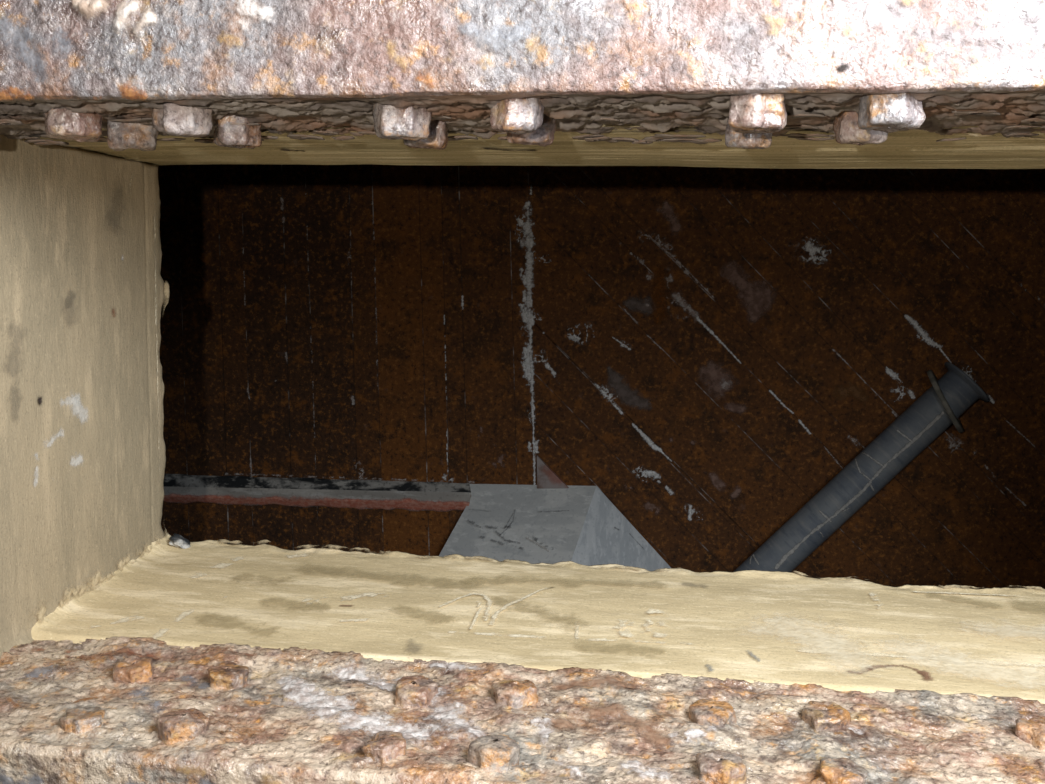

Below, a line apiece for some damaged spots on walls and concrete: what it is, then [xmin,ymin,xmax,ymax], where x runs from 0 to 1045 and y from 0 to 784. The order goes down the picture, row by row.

corrosion [0,87,31,101]
corrosion [120,85,147,101]
peeling [157,123,355,144]
peeling [584,134,708,144]
damp [802,240,831,263]
damp [516,184,556,485]
corrosion [65,648,159,660]
corrosion [847,665,932,680]
corrosion [552,675,636,690]
corrosion [587,703,670,745]